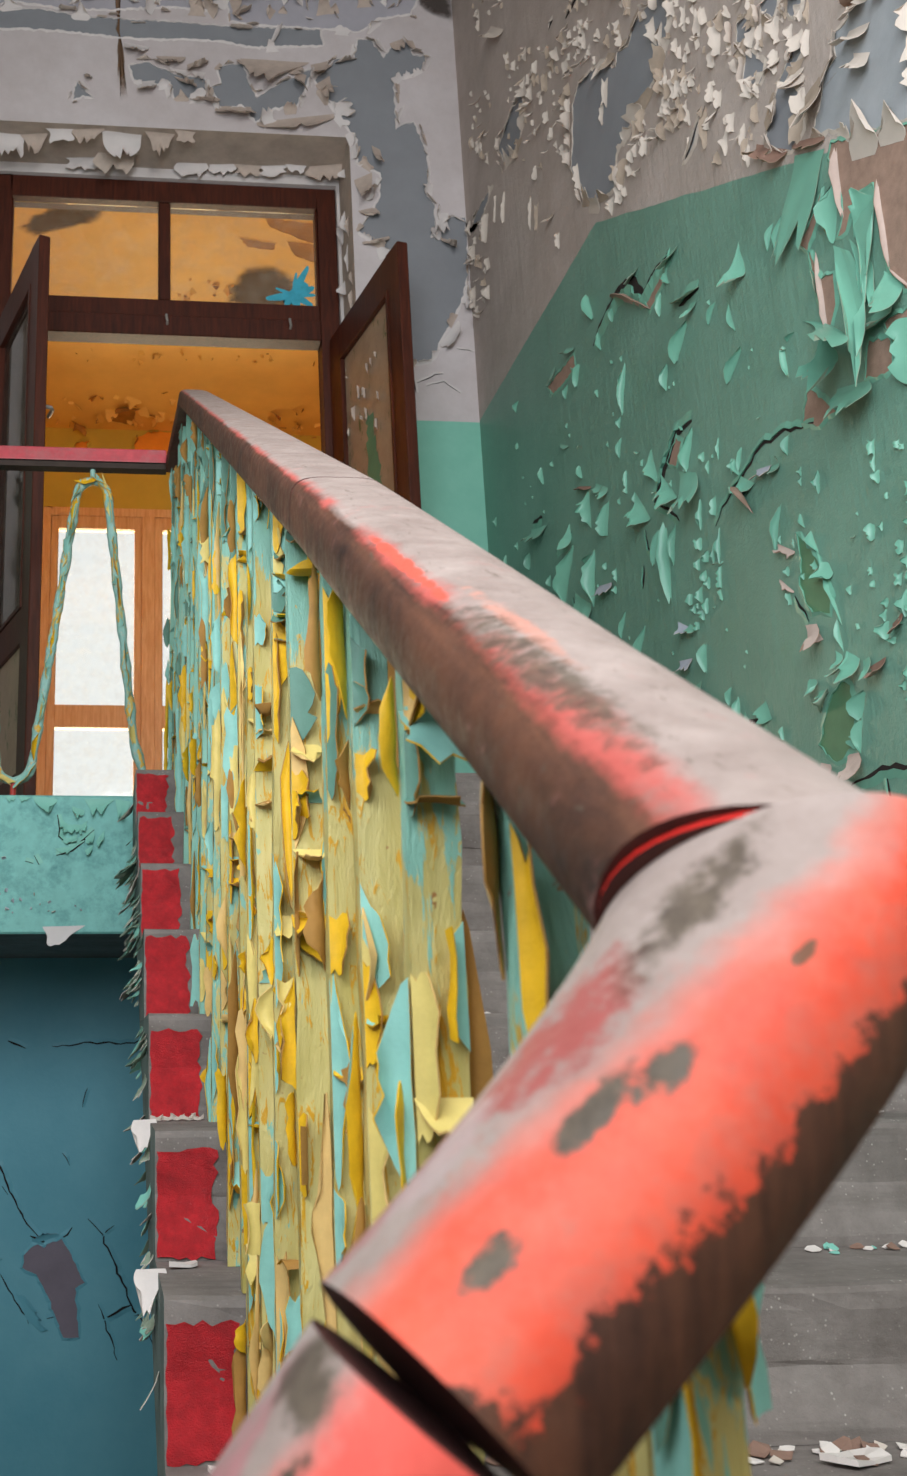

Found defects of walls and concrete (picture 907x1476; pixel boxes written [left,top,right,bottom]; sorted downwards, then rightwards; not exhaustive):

peeling [0,0,907,430]
peeling [502,348,733,689]
peeling [0,472,136,856]
crack [724,687,784,741]
crack [852,762,907,794]
peeling [0,888,84,946]
crack [8,1036,140,1049]
crack [0,1161,47,1242]
spalling [0,1225,88,1341]
crack [88,1216,152,1360]